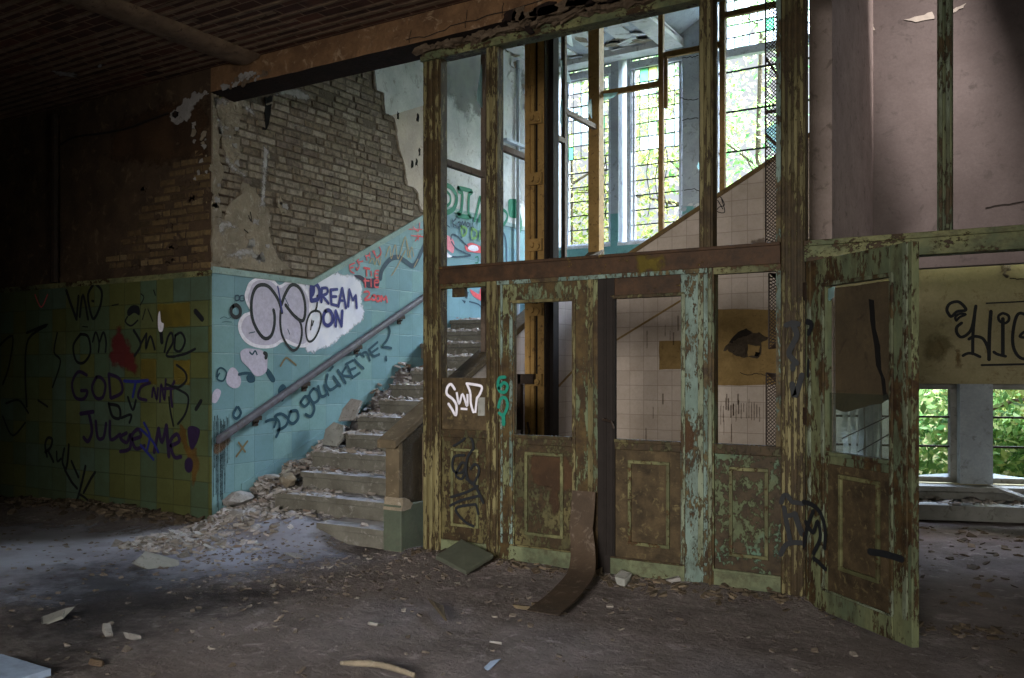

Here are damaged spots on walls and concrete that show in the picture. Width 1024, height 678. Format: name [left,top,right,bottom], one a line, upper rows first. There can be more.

spalling [191,0,665,278]
corrosion [531,456,572,515]